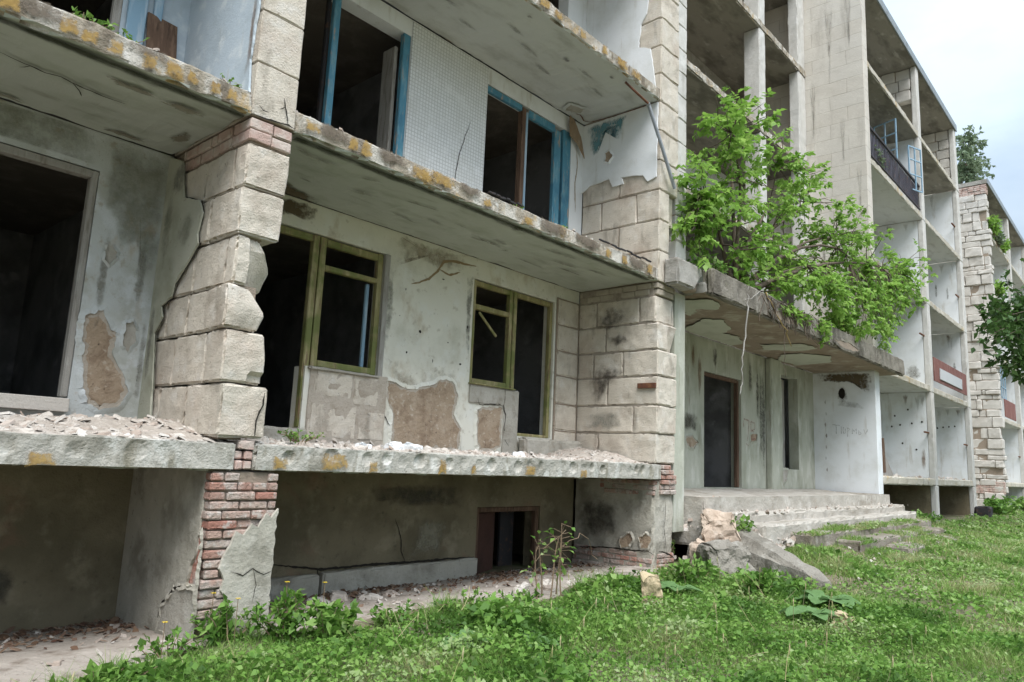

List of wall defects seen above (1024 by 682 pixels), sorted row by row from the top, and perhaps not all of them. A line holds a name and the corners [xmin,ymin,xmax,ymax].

flaking render [581,102,659,193]
flaking render [75,305,139,415]
crack [151,173,205,416]
crack [412,260,476,284]
peeling [685,299,743,346]
peeling [761,337,861,365]
flaking render [386,375,504,452]
flaking render [154,472,279,642]